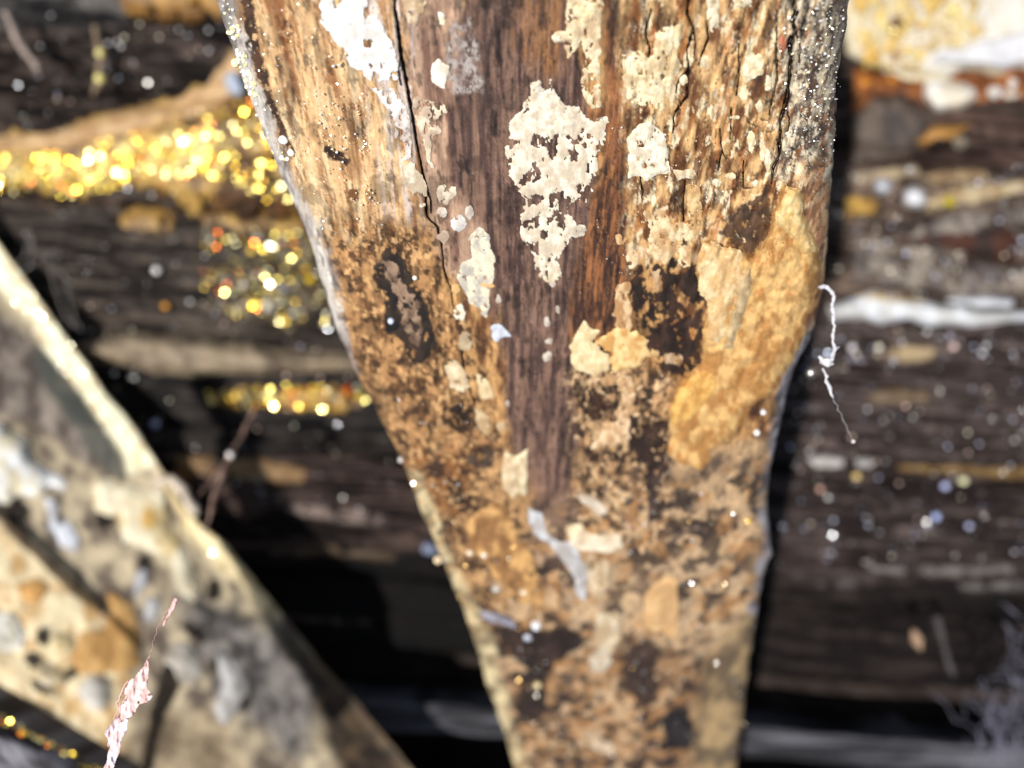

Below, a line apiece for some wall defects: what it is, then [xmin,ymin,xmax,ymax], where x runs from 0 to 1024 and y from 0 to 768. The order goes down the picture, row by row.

peeling [319,0,448,208]
crack [394,0,454,309]
peeling [431,12,484,94]
peeling [540,271,561,283]
peeling [563,224,587,238]
crack [644,8,652,57]
crack [680,180,688,245]
crack [672,0,709,133]
peeling [627,122,821,470]
crack [717,0,801,189]
peeling [569,282,683,449]